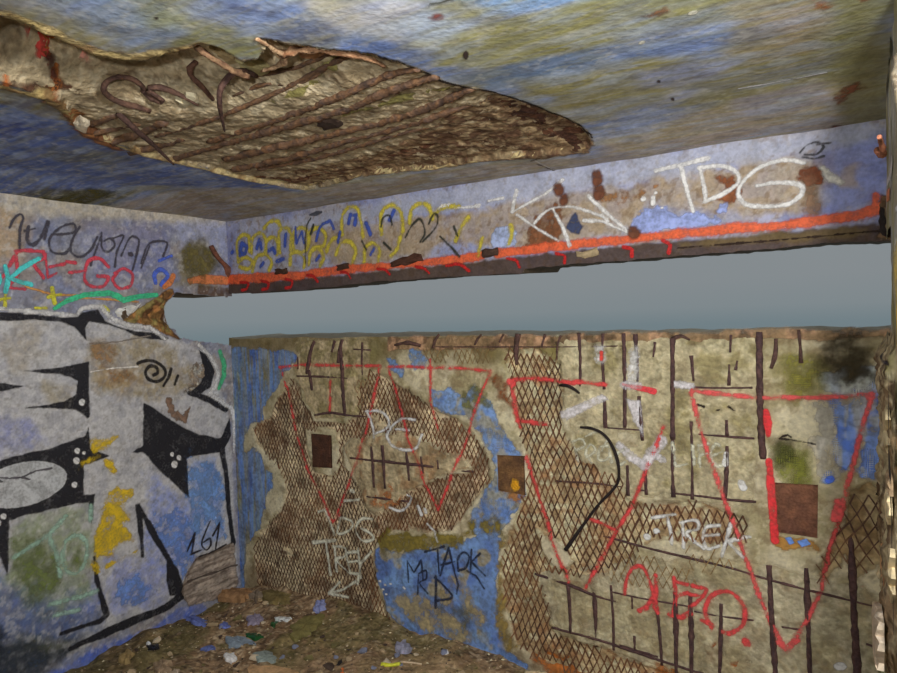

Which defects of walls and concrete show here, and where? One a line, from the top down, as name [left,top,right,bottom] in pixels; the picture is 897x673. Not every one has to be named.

spalling [0,16,594,190]
spalling [115,289,180,340]
spalling [154,327,897,673]
peeling [116,573,151,605]